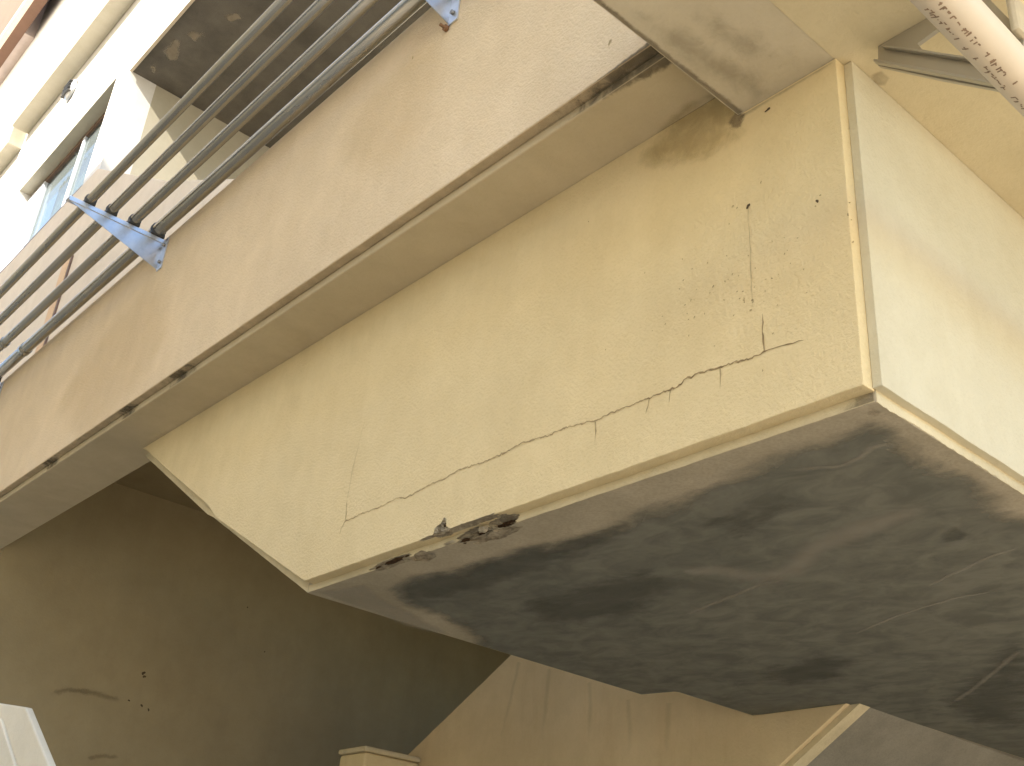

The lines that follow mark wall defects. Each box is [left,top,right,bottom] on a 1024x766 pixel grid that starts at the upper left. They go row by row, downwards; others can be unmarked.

crack [339,203,802,535]
spalling [356,512,523,576]
water stain [399,429,1024,758]